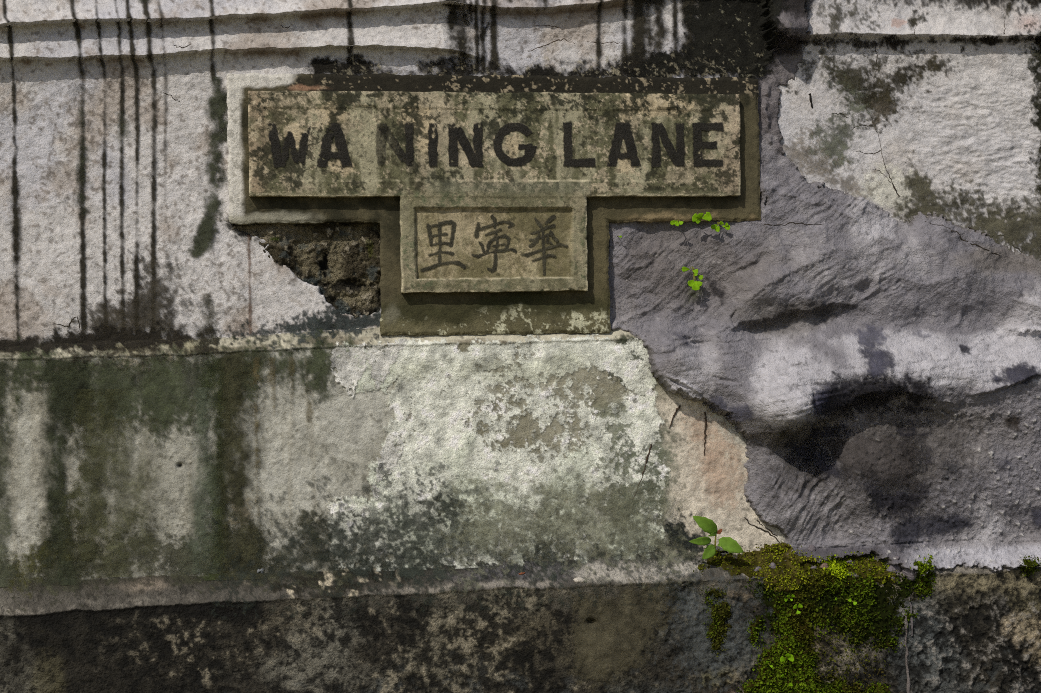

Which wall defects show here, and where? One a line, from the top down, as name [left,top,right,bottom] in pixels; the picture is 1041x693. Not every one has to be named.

flaking render [232,222,381,318]
damp [0,0,708,615]
damp [409,0,1041,194]
crack [833,113,900,197]
damp [886,143,1041,261]
damp [785,325,970,551]